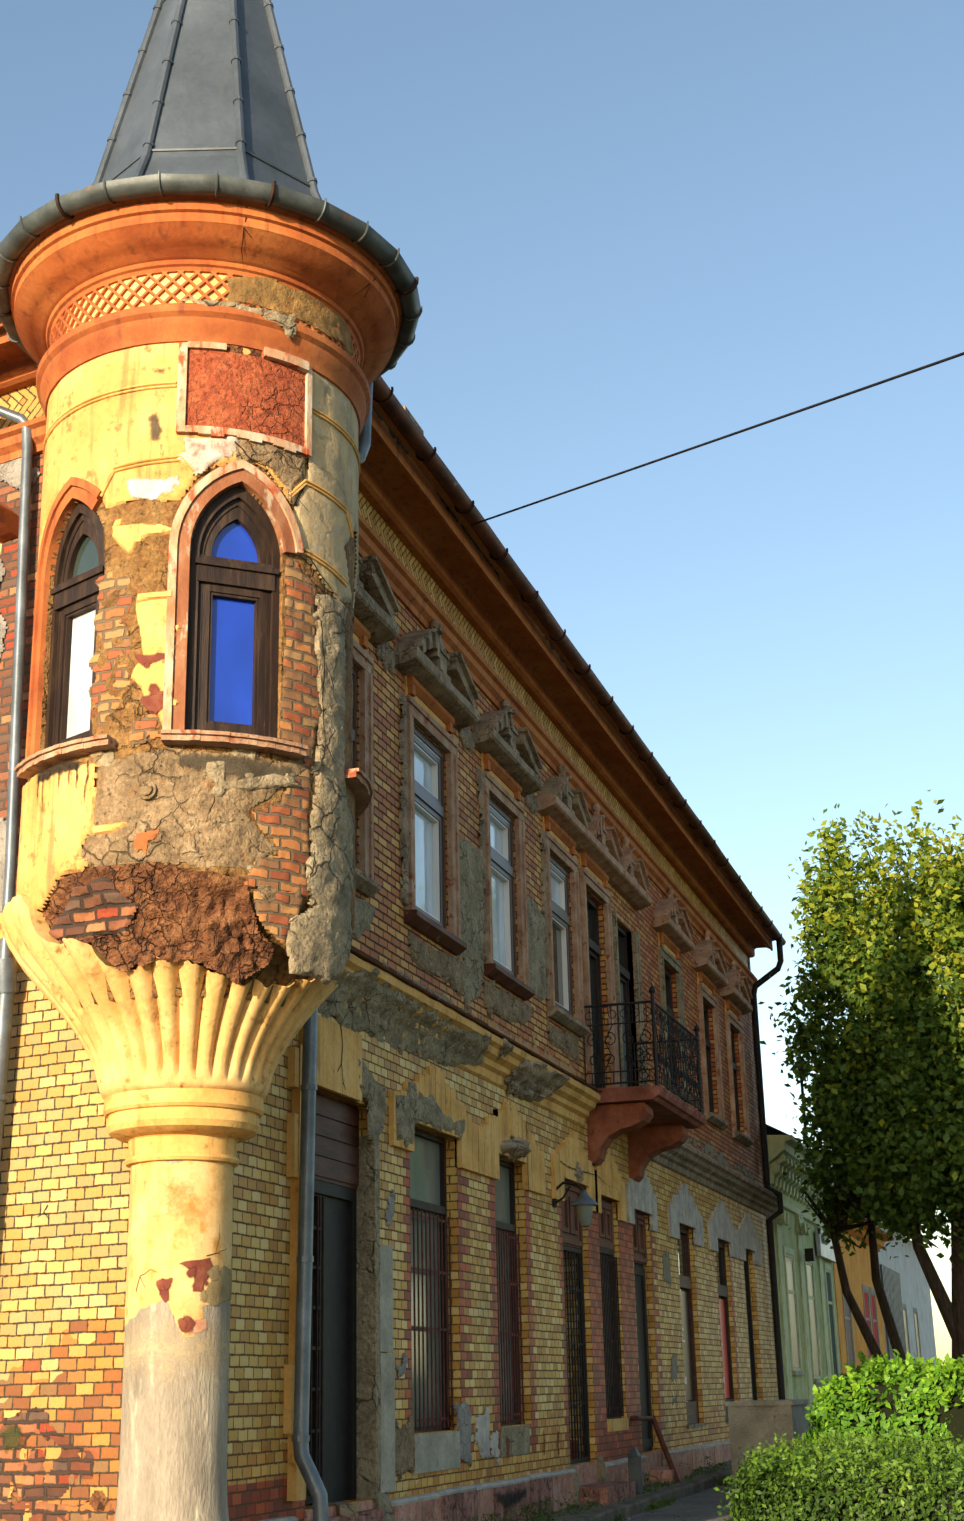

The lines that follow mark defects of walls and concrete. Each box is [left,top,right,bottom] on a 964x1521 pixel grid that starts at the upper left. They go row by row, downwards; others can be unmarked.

spalling [227,345,262,358]
spalling [181,276,353,356]
spalling [0,436,322,984]
spalling [318,960,577,1102]
peeling [123,1258,232,1373]